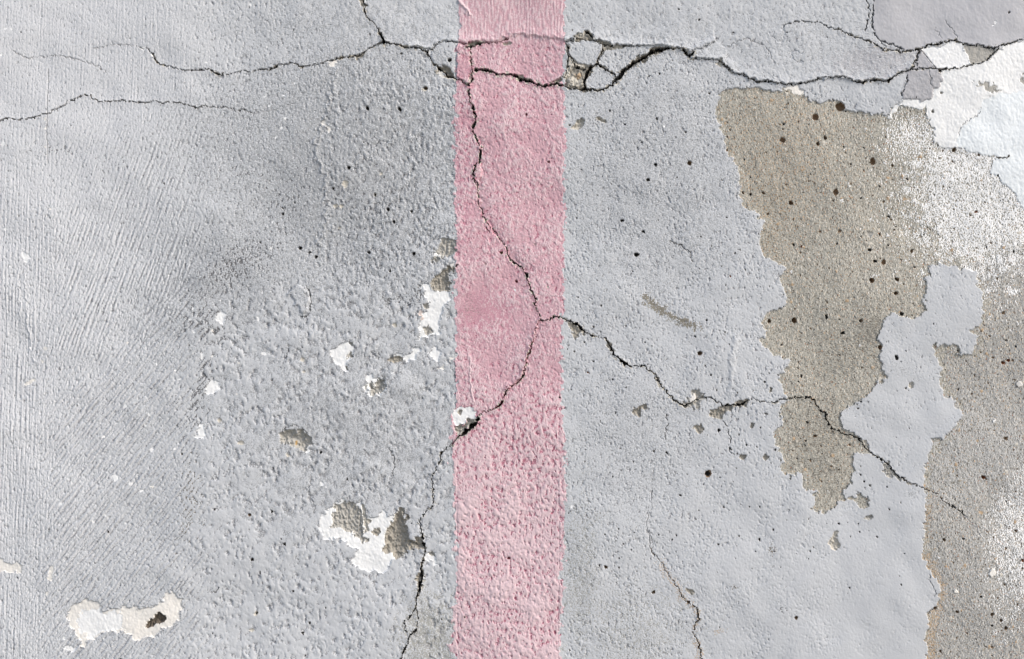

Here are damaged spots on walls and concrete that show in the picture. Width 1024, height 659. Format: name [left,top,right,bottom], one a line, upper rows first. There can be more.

crack [93,44,248,76]
crack [1,51,296,164]
peeling [387,284,457,372]
crack [259,0,1023,659]
peeling [715,50,1024,659]
peeling [452,406,481,436]
peeling [319,499,438,575]
peeling [64,590,184,652]